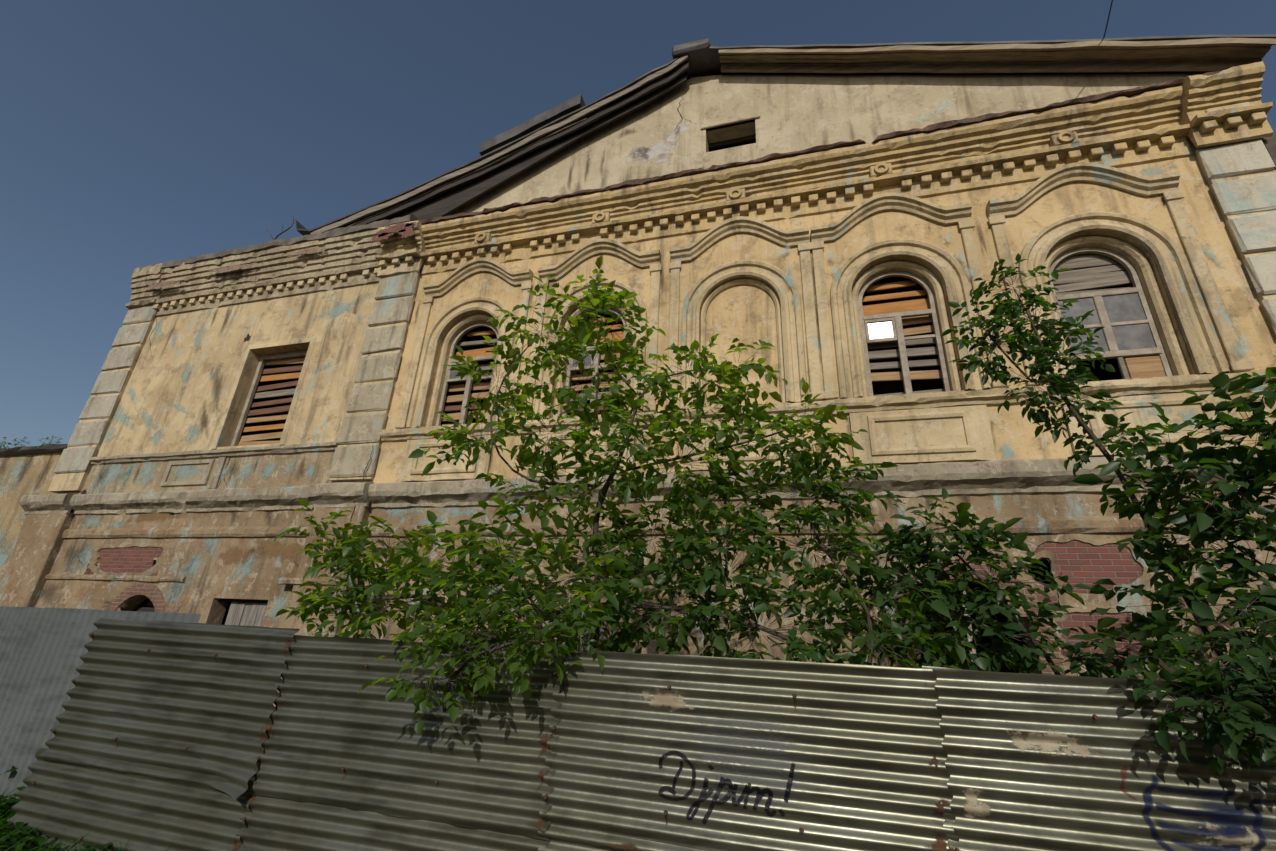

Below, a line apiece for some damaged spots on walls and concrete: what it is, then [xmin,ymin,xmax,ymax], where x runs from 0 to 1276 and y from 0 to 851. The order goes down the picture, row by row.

flaking render [626,122,690,164]
spalling [70,542,177,584]
spalling [1004,534,1162,676]
rust [933,800,948,817]
rust [928,835,955,851]